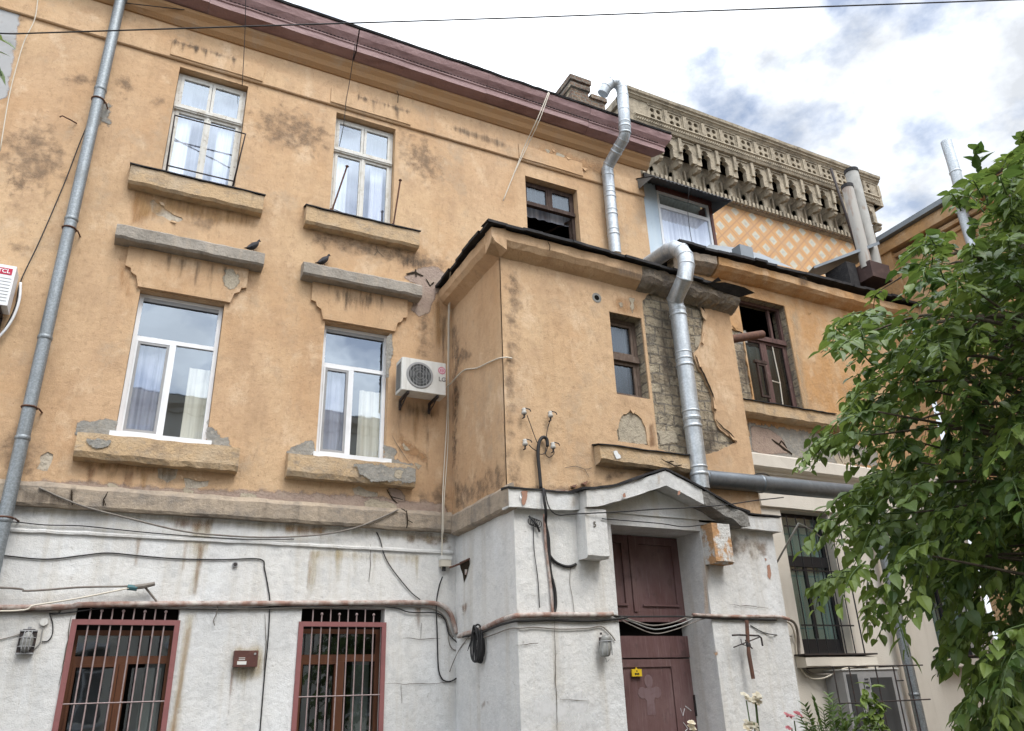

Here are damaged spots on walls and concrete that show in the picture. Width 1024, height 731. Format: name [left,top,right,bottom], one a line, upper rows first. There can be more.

peeling [405,266,444,316]
spalling [613,409,678,459]
peeling [36,452,447,512]